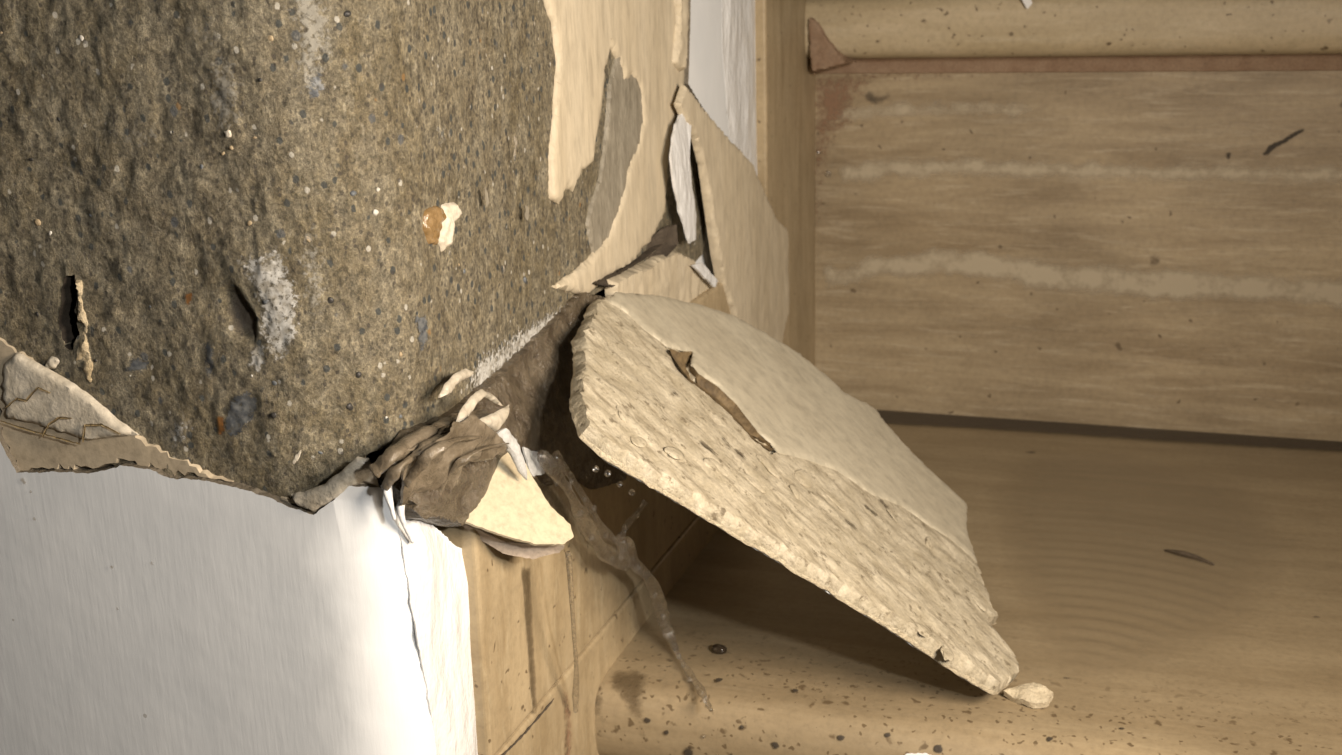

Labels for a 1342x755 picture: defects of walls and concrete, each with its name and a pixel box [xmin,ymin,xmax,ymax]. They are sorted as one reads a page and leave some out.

spalling [0,0,718,512]